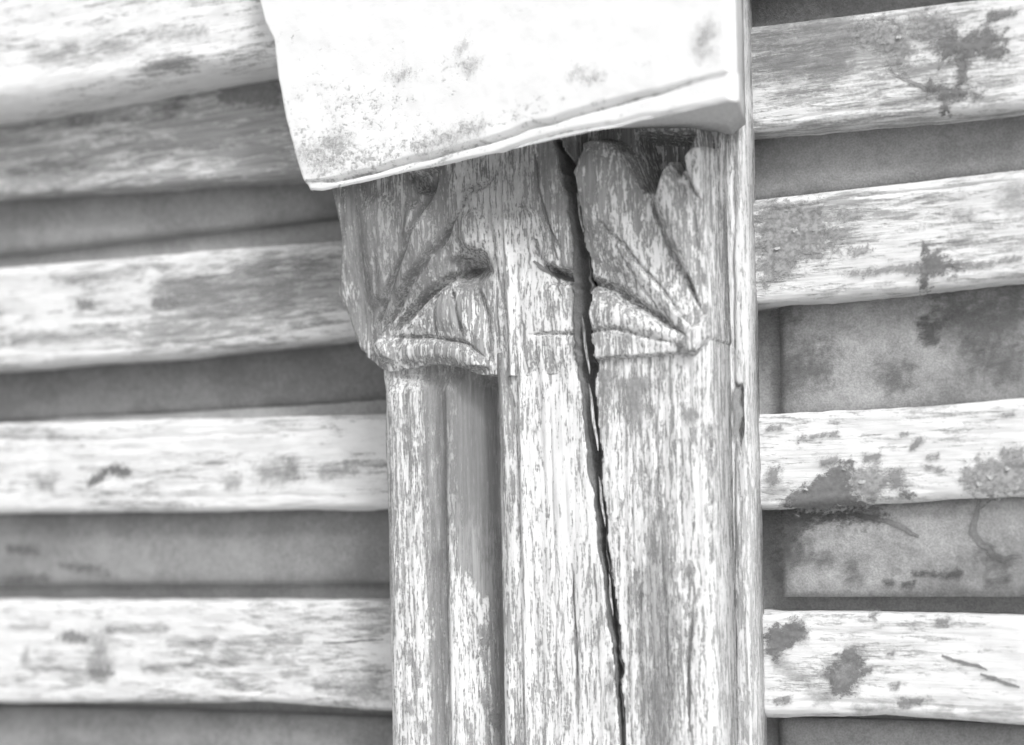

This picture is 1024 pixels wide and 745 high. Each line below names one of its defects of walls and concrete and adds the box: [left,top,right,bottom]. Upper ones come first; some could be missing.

damp [887,7,1018,118]
crack [533,141,626,745]
peeling [598,364,654,439]
peeling [679,403,717,477]
damp [797,431,840,444]
damp [925,452,945,473]
damp [777,506,888,563]
peeling [473,620,493,662]
peeling [629,569,646,653]
peeling [677,563,698,664]
damp [762,616,808,664]
peeling [478,686,501,732]